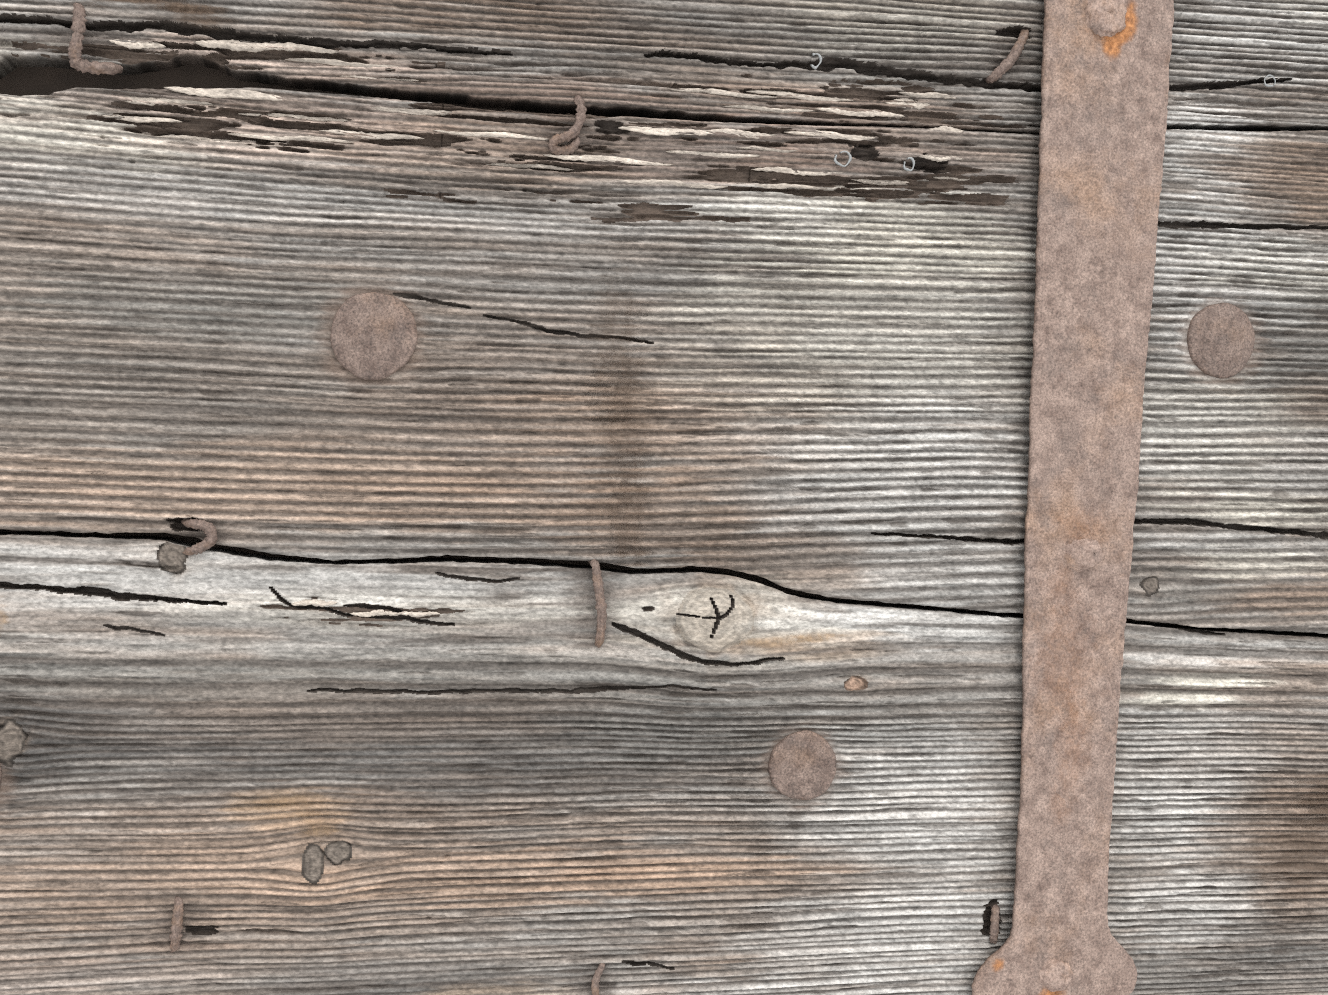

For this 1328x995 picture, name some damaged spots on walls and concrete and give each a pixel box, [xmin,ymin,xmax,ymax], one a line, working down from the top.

crack [0,13,513,56]
corrosion [1104,5,1135,55]
crack [871,532,1024,546]
crack [1134,518,1328,539]
crack [435,572,520,583]
crack [0,582,227,637]
crack [269,587,455,626]
crack [1178,627,1226,635]